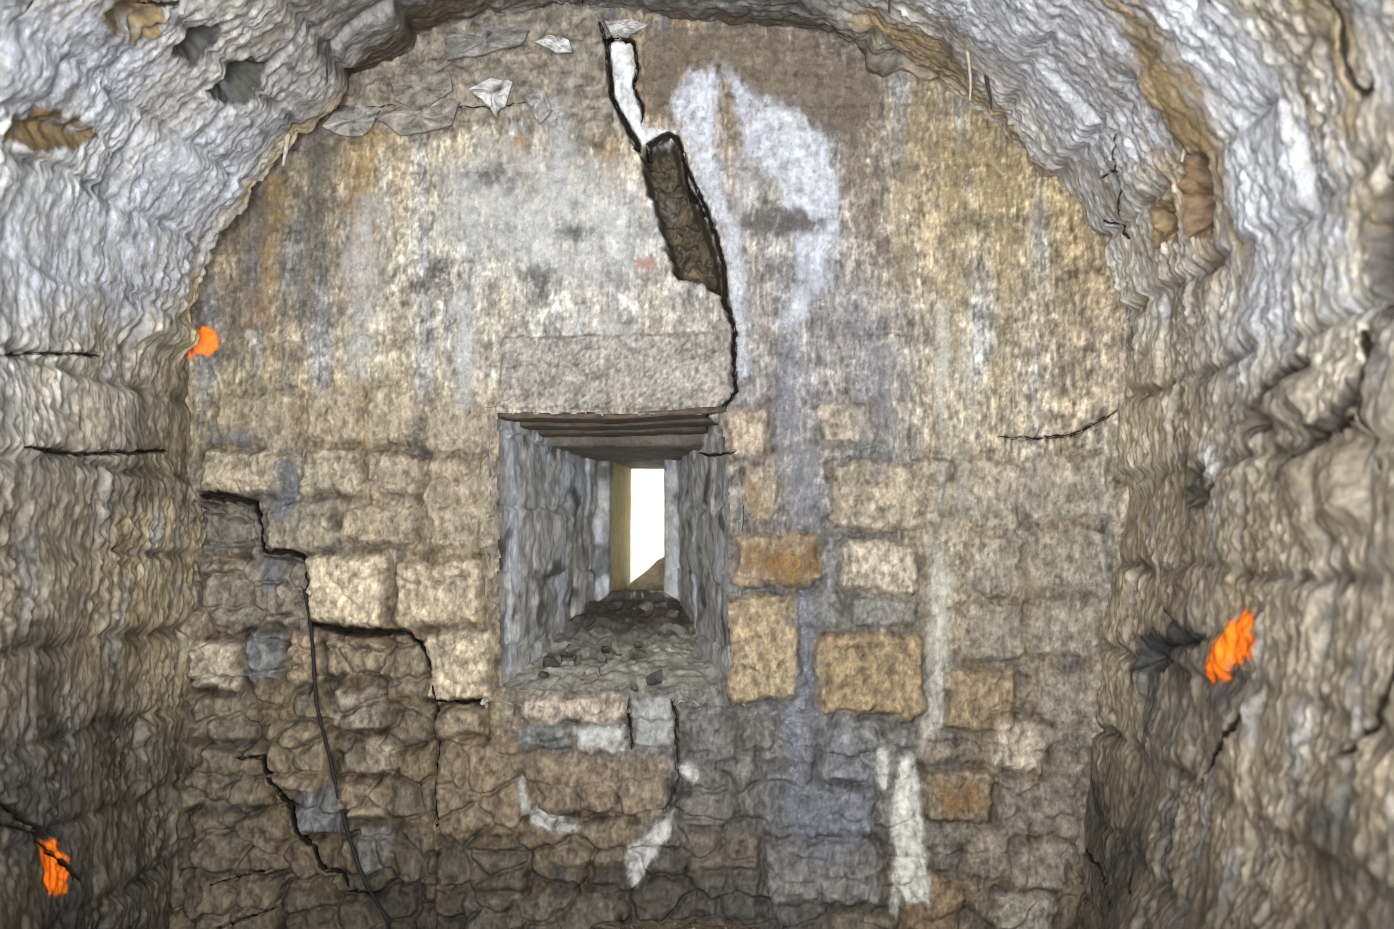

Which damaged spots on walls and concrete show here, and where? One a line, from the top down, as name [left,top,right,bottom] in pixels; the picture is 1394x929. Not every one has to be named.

leakage [284,0,558,317]
flaking render [322,25,573,177]
crack [581,0,738,417]
peeling [605,18,838,376]
leakage [645,8,899,195]
crack [1329,0,1375,98]
leakage [935,302,949,411]
crack [199,490,482,828]
leakage [876,542,951,913]
crack [210,867,272,886]
crack [216,906,281,929]
crack [232,755,380,894]